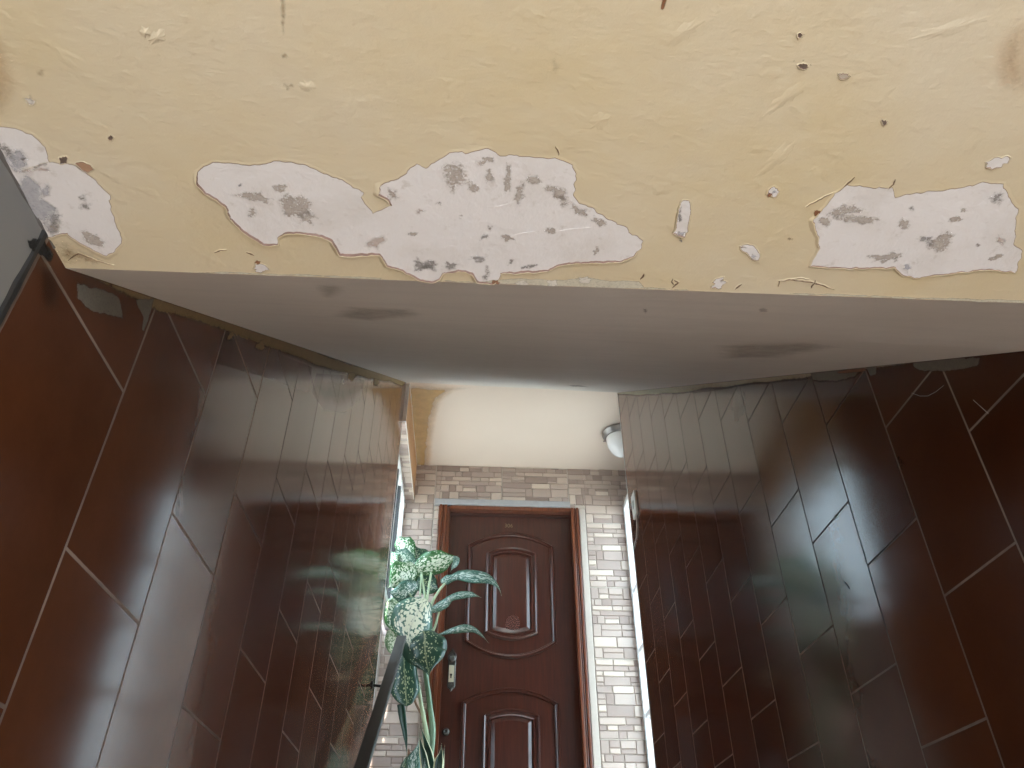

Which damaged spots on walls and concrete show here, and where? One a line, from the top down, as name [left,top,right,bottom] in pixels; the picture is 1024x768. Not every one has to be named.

peeling [0,123,126,260]
peeling [193,146,661,290]
peeling [672,199,692,242]
peeling [739,243,761,261]
peeling [806,155,1024,280]